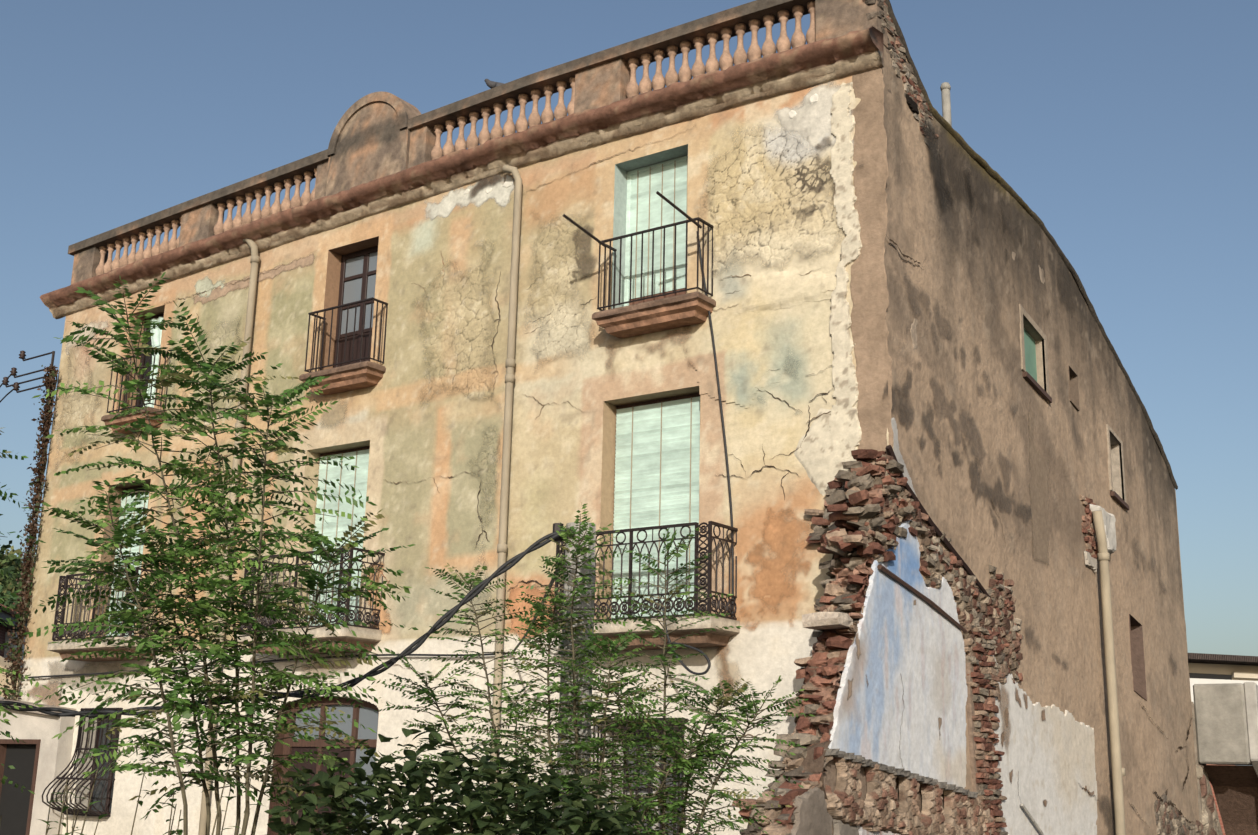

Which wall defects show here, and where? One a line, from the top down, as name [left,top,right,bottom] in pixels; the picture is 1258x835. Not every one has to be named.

flaking render [426,175,514,220]
crack [700,127,841,310]
spalling [776,0,939,455]
leakage [923,121,952,209]
crack [387,215,596,630]
crack [720,365,834,500]
leakage [884,371,1031,523]
spalling [1079,494,1117,573]
spalling [506,583,554,639]
spalling [747,510,874,700]
spalling [732,695,835,835]
peeling [995,683,1046,746]